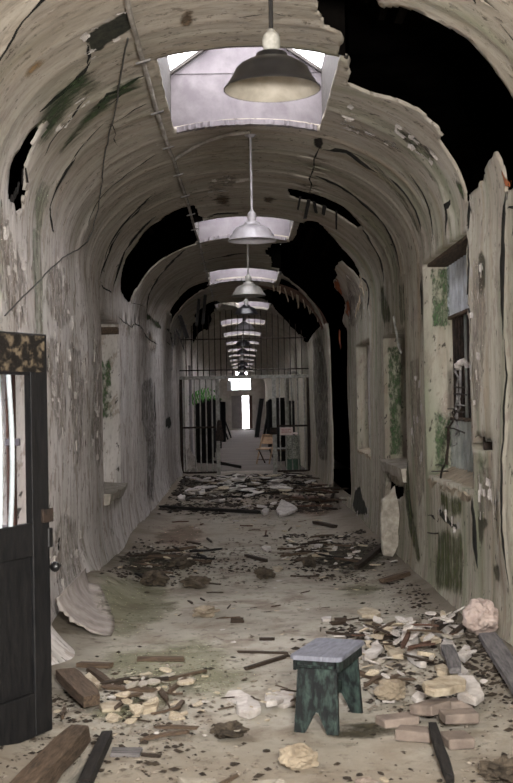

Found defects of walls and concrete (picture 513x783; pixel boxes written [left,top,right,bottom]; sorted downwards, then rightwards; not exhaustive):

crack [0,0,66,82]
peeling [341,104,438,165]
crack [466,0,513,58]
peeling [0,214,101,464]
crack [293,144,473,341]
crack [470,192,513,589]